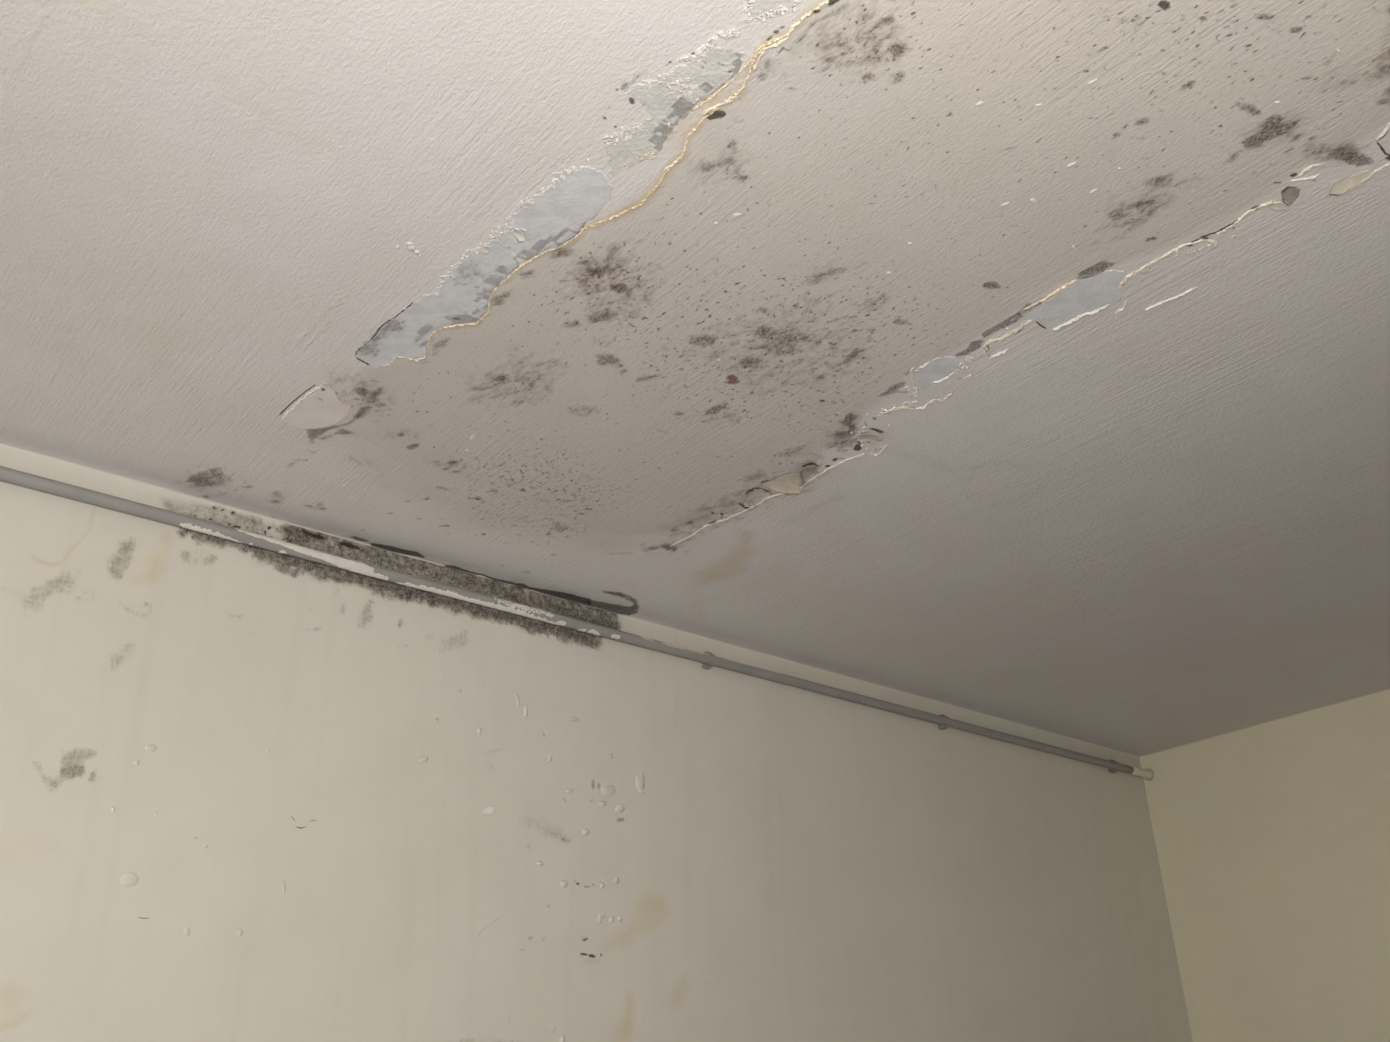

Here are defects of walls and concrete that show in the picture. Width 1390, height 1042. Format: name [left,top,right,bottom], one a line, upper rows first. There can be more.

water stain [1243,106,1297,147]
peeling [355,0,805,367]
spalling [1267,163,1325,210]
peeling [1013,263,1135,331]
peeling [1144,286,1198,310]
peeling [840,355,982,456]
water stain [185,478,638,645]